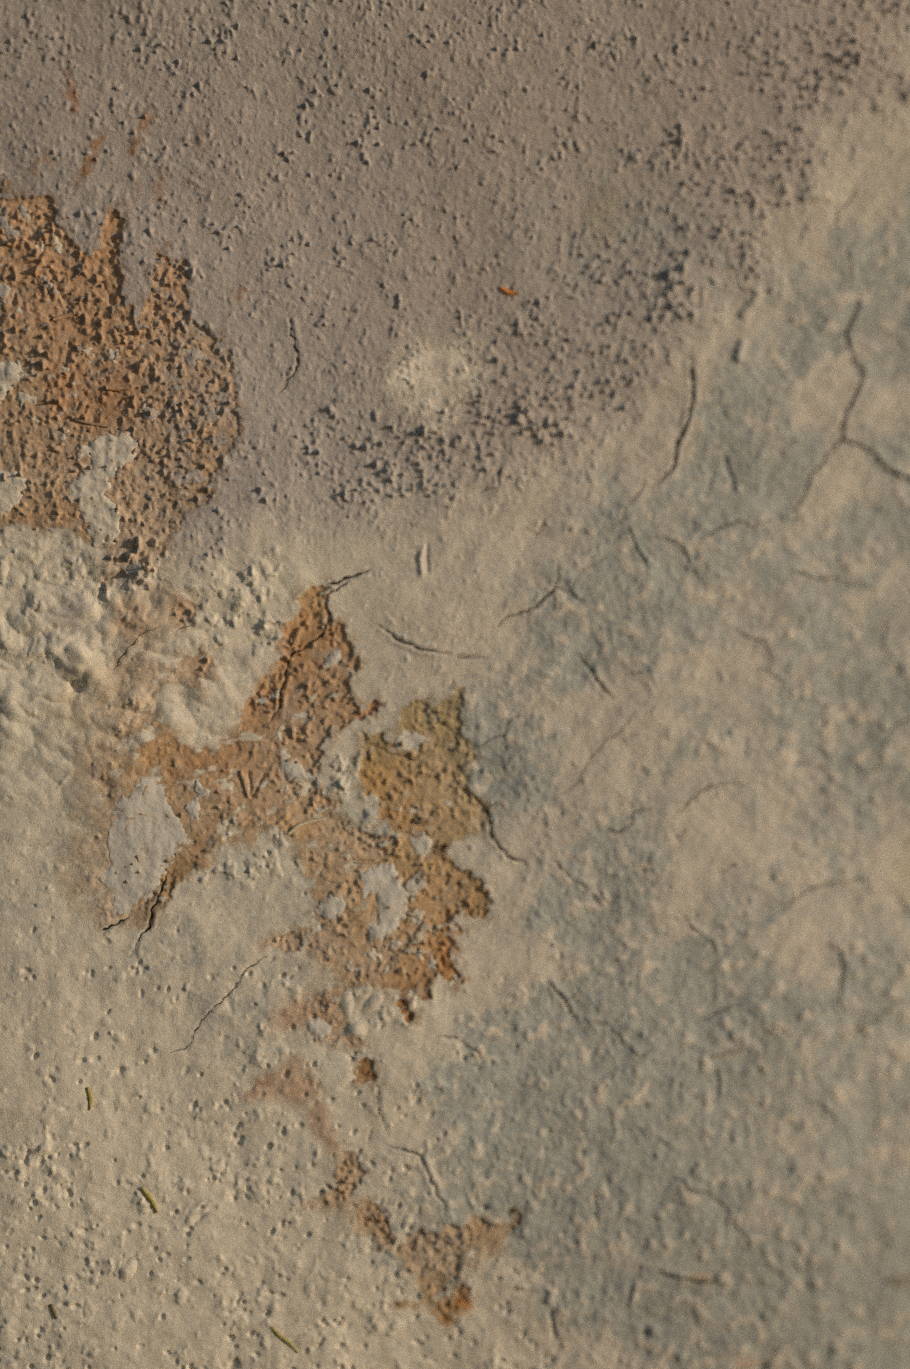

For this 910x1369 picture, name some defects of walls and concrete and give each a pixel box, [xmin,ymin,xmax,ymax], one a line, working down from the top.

peeling [0,188,243,589]
crack [499,186,910,626]
crack [380,624,491,660]
crack [558,653,648,797]
peeling [59,585,492,1083]
crack [365,715,750,905]
crack [547,979,656,1058]
crack [838,941,906,1038]
crack [377,1086,446,1223]
peeling [329,1151,522,1324]
crack [658,1136,748,1250]